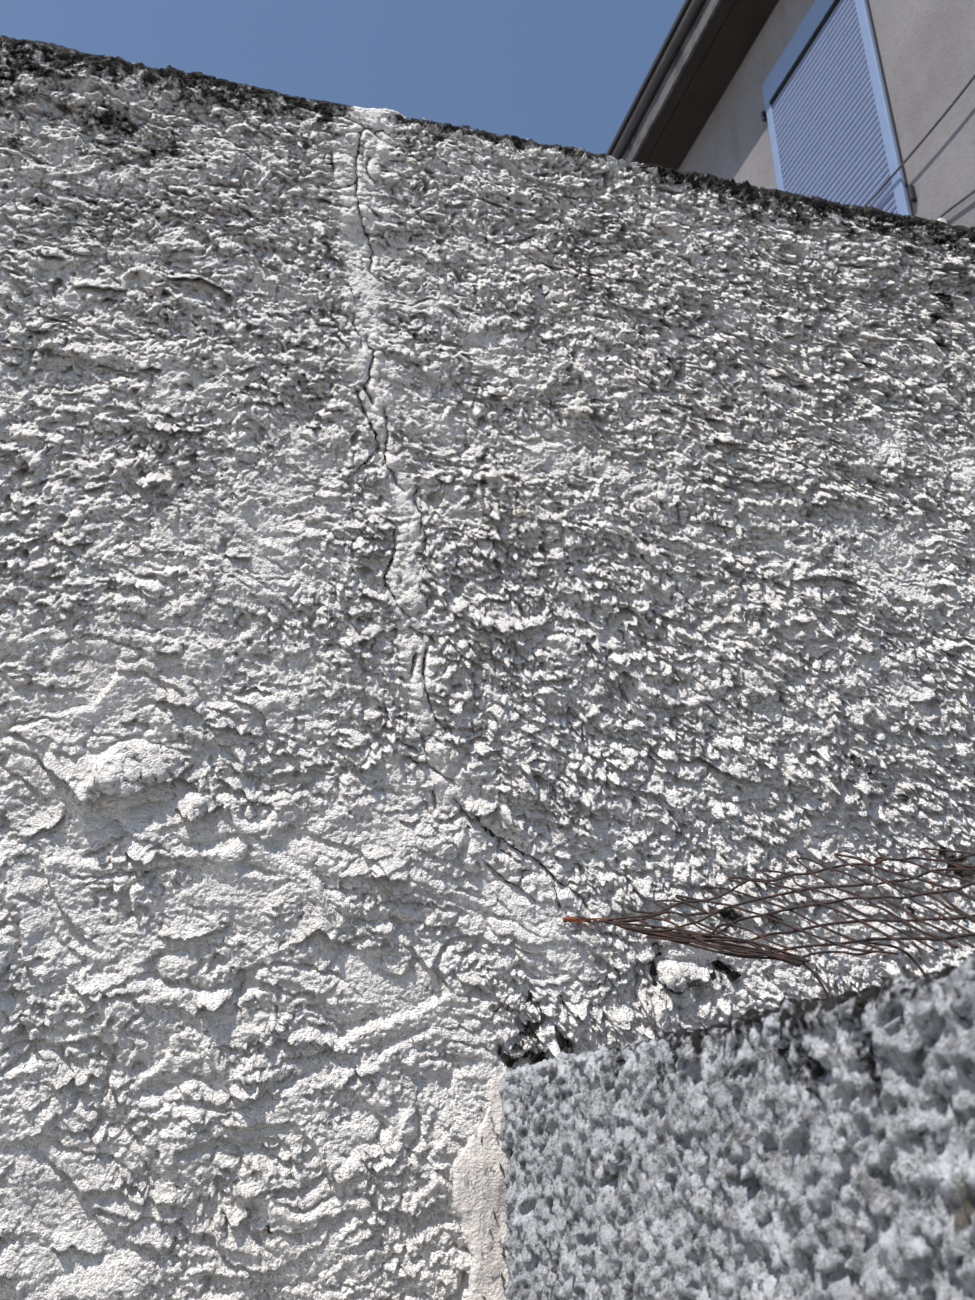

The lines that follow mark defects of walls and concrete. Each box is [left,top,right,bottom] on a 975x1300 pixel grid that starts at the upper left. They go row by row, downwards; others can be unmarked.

crack [319,113,682,994]
crack [710,960,742,983]